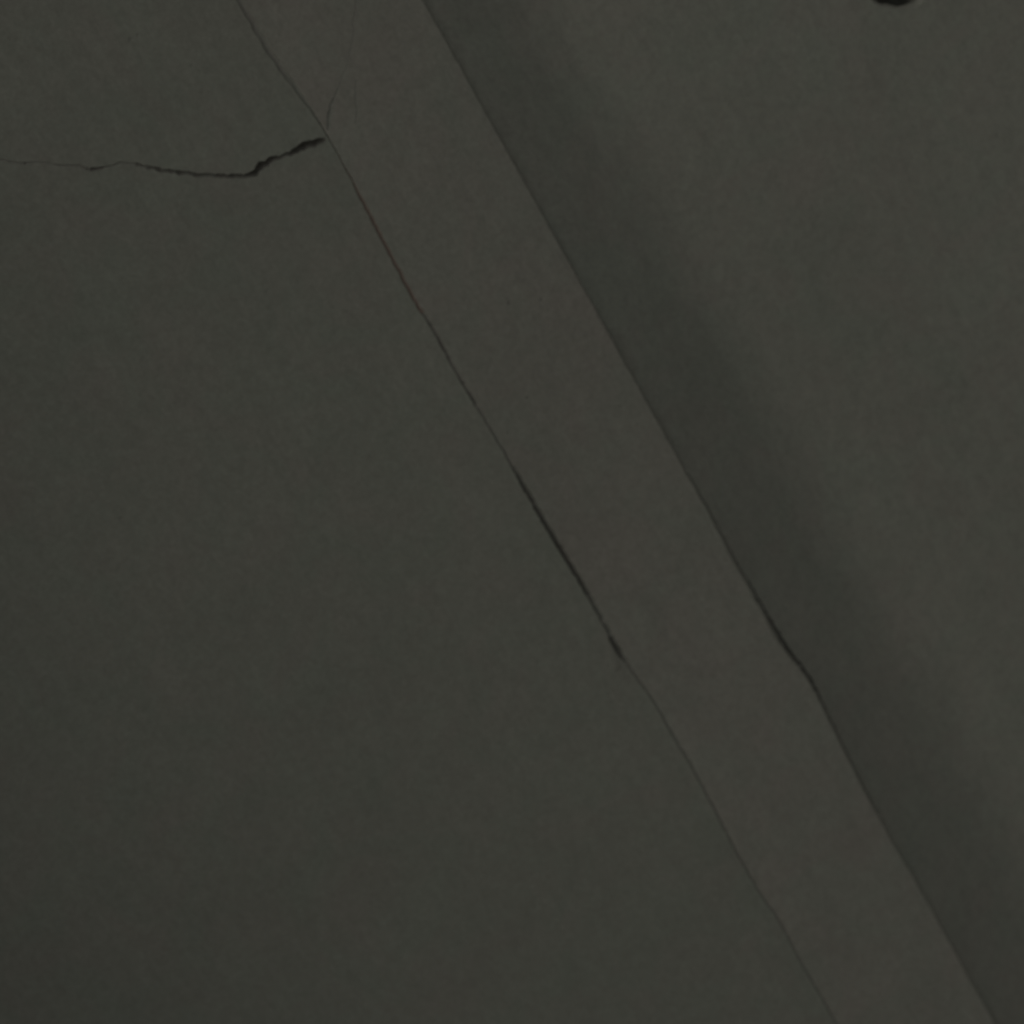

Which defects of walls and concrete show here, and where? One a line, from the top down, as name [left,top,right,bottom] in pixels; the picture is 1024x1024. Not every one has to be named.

crack [0,138,326,179]
crack [237,0,840,1024]